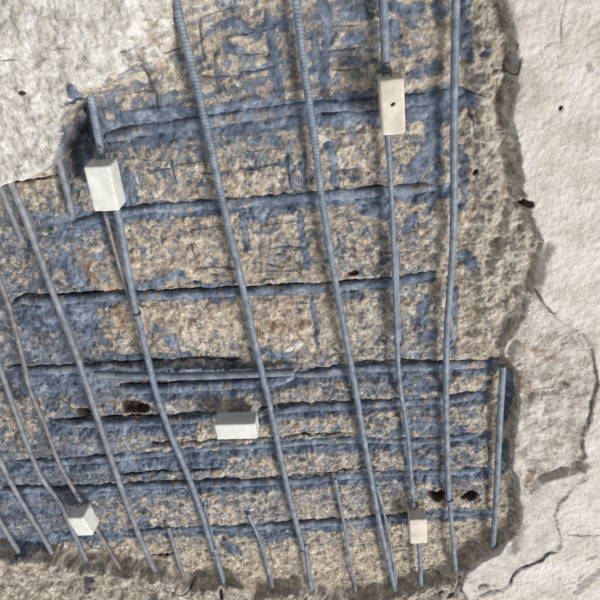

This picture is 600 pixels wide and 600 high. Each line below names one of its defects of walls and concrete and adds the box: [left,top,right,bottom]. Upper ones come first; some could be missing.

spalling [72,209,258,372]
spalling [248,292,348,372]
spalling [342,287,396,365]
crack [534,289,557,315]
spalling [0,360,97,563]
spalling [92,310,218,580]
spalling [198,486,292,526]
spalling [277,413,360,441]
spalling [449,370,499,511]
crack [538,349,599,475]
spalling [0,511,499,600]
crack [481,552,557,595]